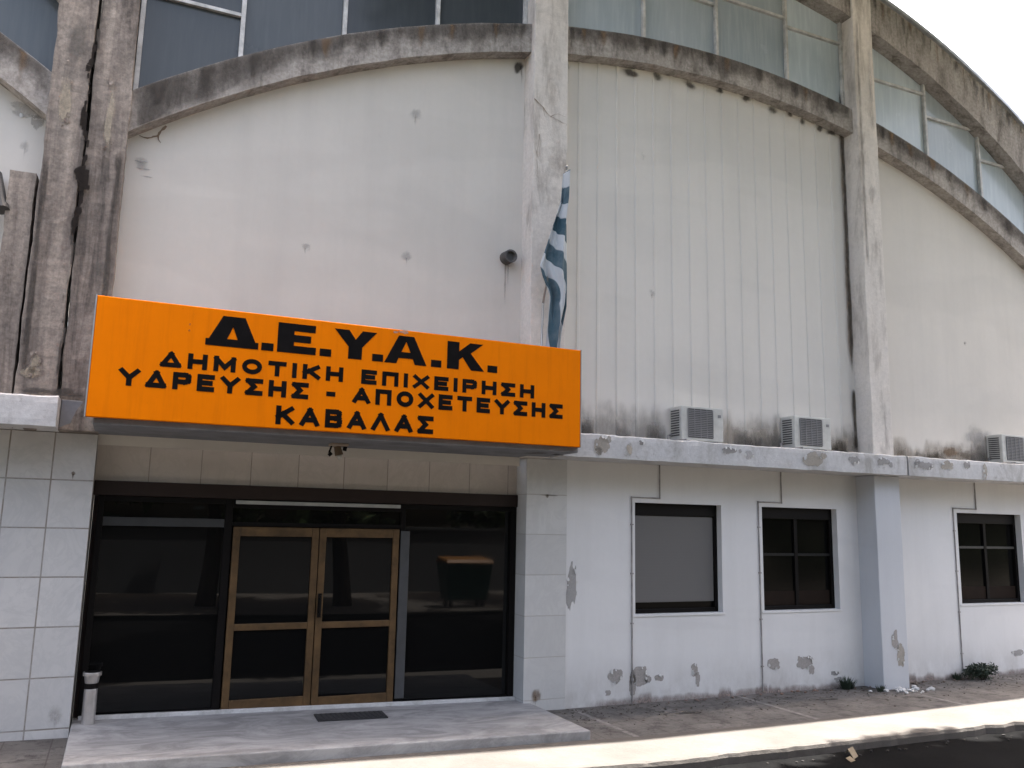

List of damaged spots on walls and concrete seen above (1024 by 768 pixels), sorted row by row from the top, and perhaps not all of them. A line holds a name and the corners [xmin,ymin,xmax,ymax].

spalling [594,435,611,455]
spalling [803,452,827,466]
peeling [566,561,577,609]
peeling [892,630,905,666]
peeling [605,666,664,696]
peeling [691,663,700,686]
peeling [767,658,780,670]
peeling [797,656,815,674]